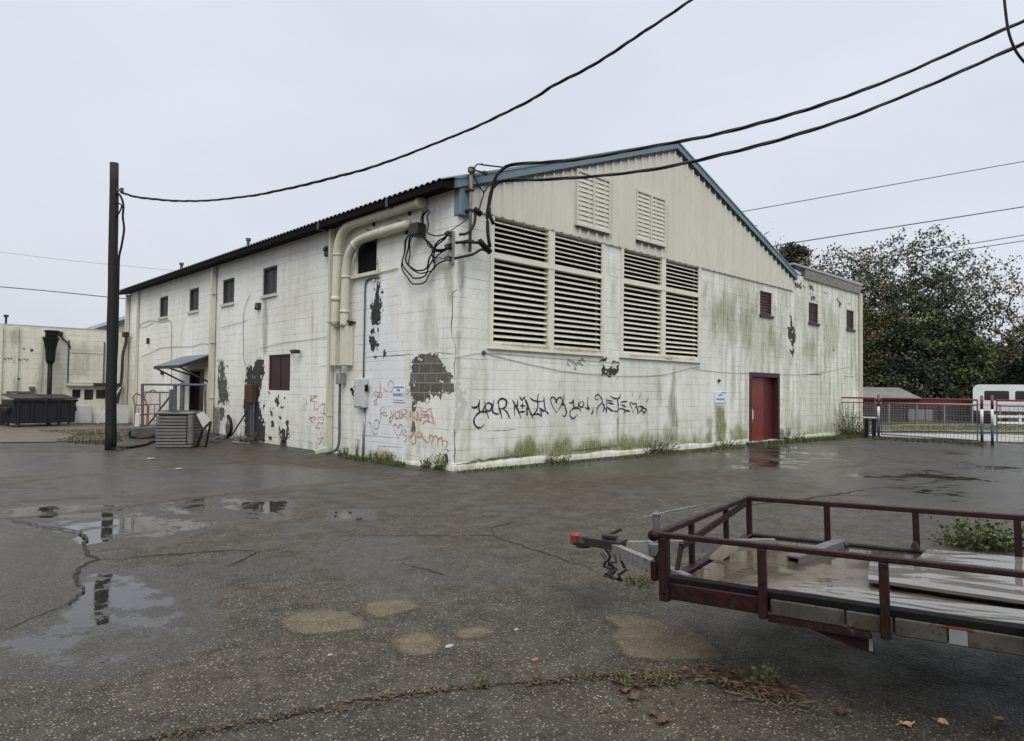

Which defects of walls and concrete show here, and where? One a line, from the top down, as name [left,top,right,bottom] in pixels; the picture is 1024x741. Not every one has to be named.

peeling [217,359,230,435]
peeling [243,358,290,446]
peeling [369,279,386,359]
spalling [409,351,468,435]
peeling [600,357,619,379]
peeling [788,314,797,357]